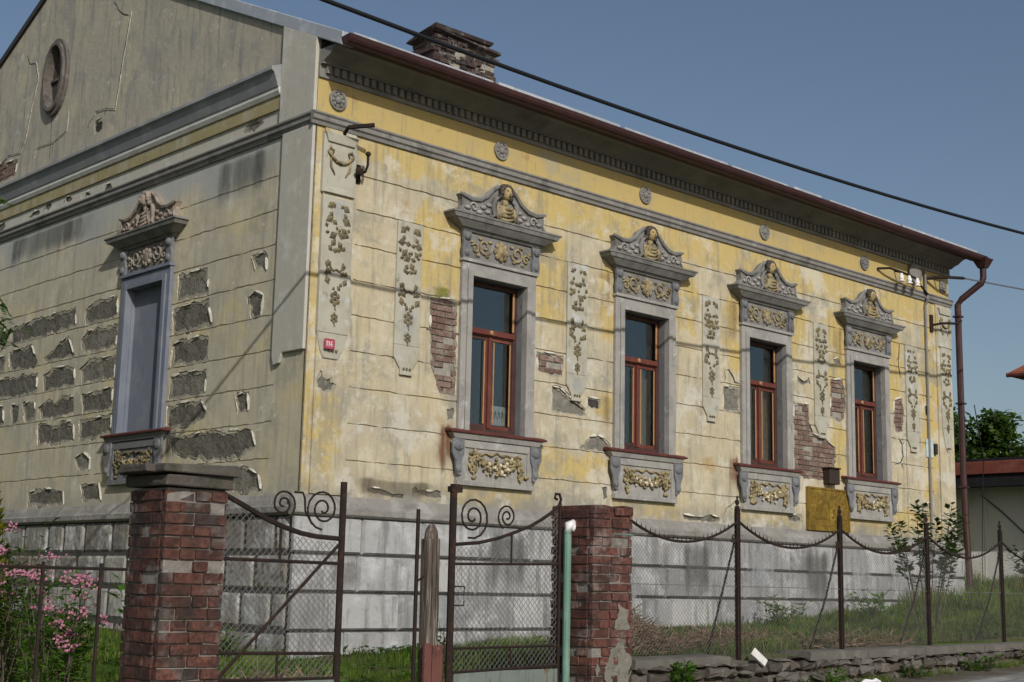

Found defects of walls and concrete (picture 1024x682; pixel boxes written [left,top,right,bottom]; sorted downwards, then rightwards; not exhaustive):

flaking render [0,159,18,183]
peeling [0,295,119,503]
peeling [165,268,264,496]
flaking render [426,297,458,420]
peeling [536,350,600,416]
peeling [722,385,739,414]
flaking render [793,402,837,480]
flaking render [892,397,905,433]
peeling [28,487,64,508]